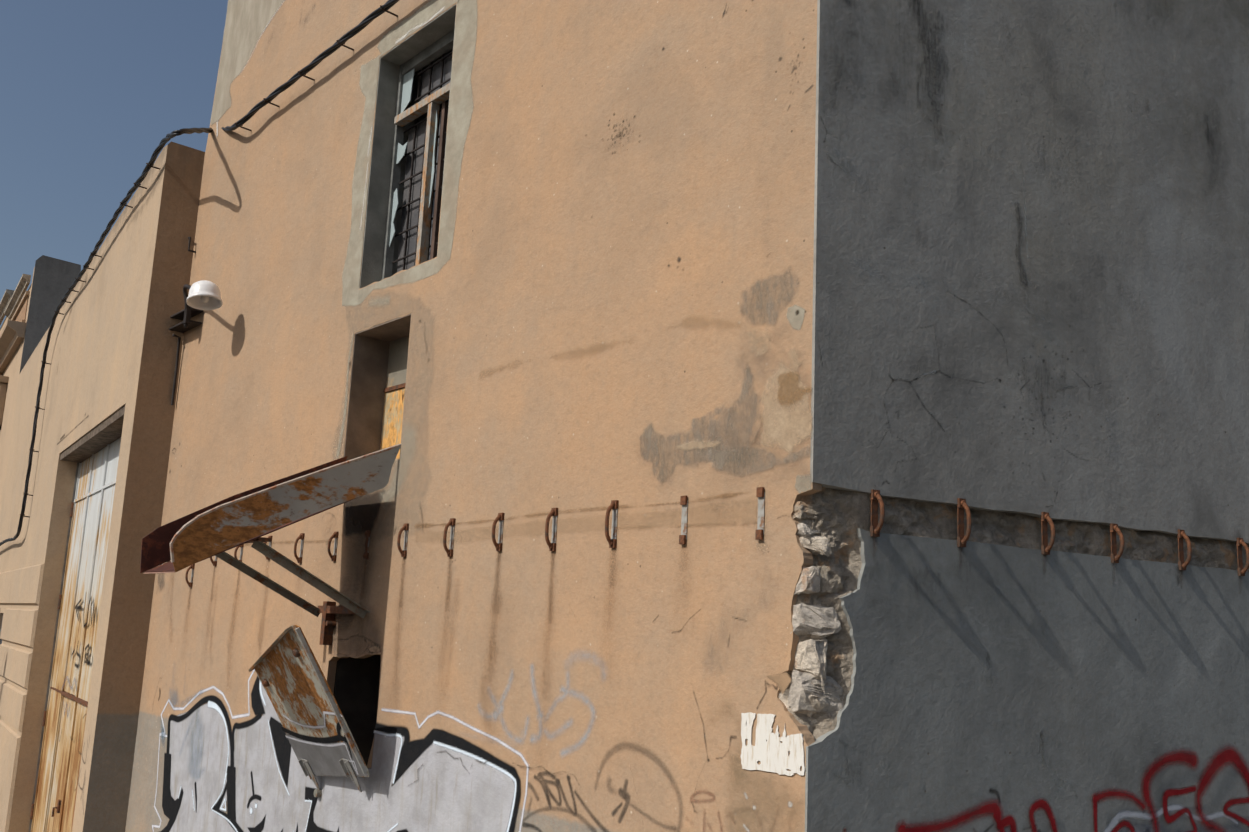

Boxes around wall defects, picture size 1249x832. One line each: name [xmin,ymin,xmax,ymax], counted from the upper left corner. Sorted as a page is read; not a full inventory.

water stain [641,352,812,481]
spalling [779,487,1249,740]